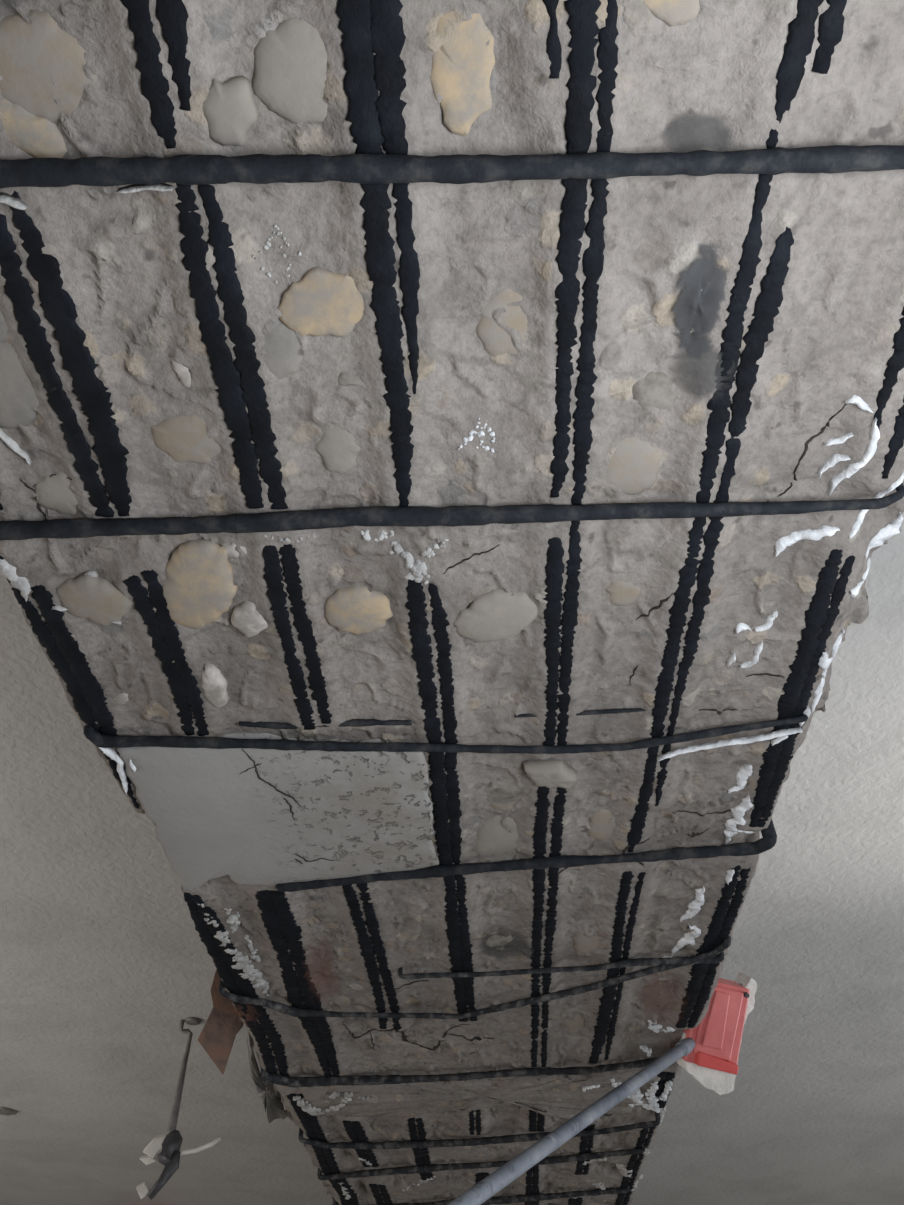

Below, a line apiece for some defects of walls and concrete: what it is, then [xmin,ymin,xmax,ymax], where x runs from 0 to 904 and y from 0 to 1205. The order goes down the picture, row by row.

spalling [0,0,904,160]
crack [767,403,848,502]
spalling [0,169,904,1088]
crack [239,749,300,817]
crack [343,1021,494,1050]
peeling [0,1106,18,1116]
spalling [273,1084,571,1205]
spalling [488,1061,681,1205]